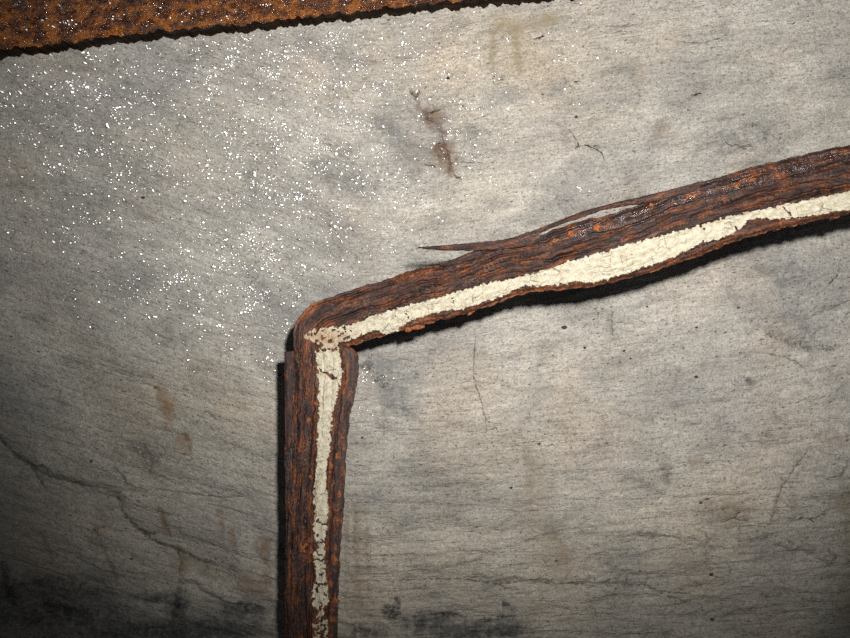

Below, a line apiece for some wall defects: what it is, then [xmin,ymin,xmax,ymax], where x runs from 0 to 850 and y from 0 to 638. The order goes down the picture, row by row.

rust [426,136,462,180]
rust [284,145,850,638]
crack [2,441,89,486]
crack [116,495,208,563]